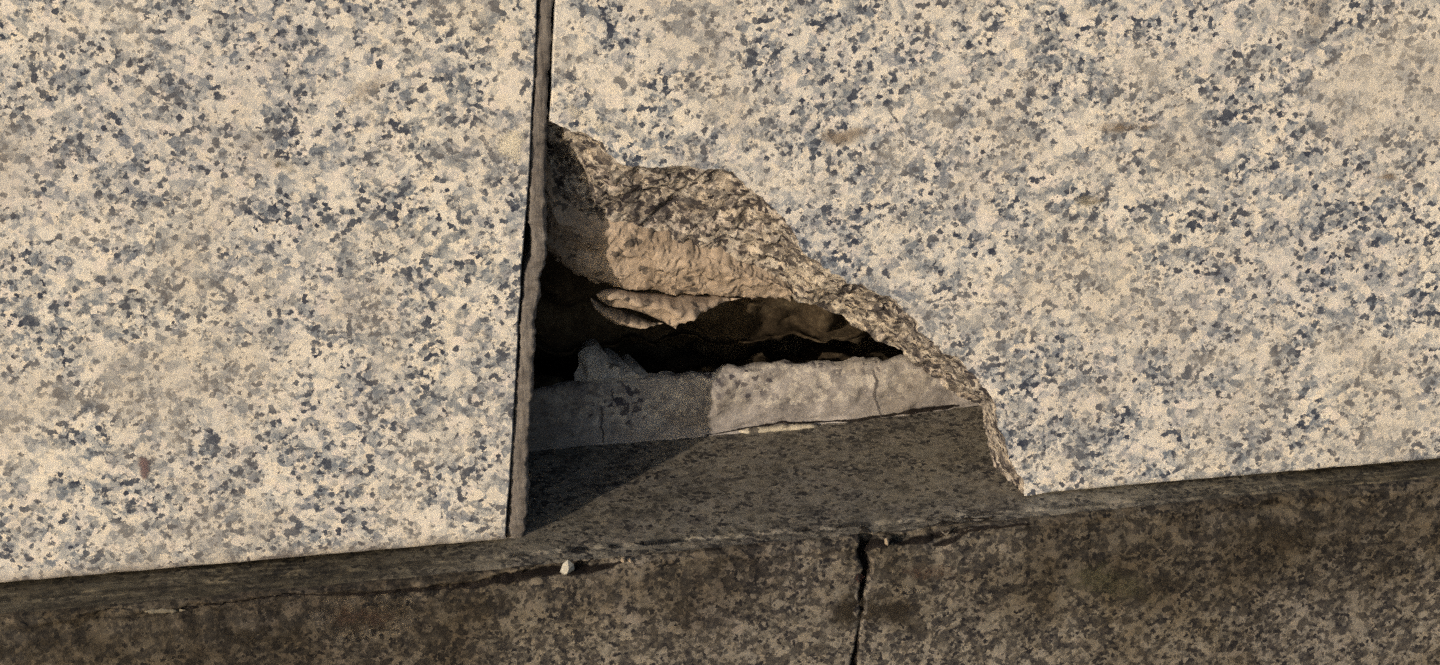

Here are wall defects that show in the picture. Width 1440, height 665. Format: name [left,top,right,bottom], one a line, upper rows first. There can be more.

spalling [546,121,1024,495]
crack [140,561,626,614]
crack [851,523,1030,665]